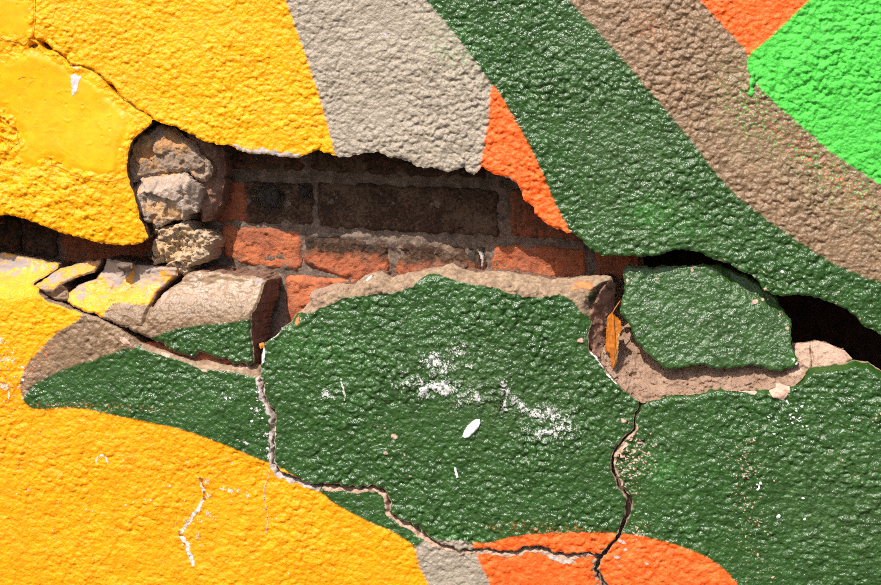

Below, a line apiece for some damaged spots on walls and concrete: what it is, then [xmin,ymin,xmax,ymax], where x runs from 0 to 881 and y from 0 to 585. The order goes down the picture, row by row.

spalling [0,109,18,163]
spalling [126,119,157,243]
peeling [233,144,301,157]
spalling [2,250,207,372]
spalling [107,254,282,372]
crack [255,375,640,585]